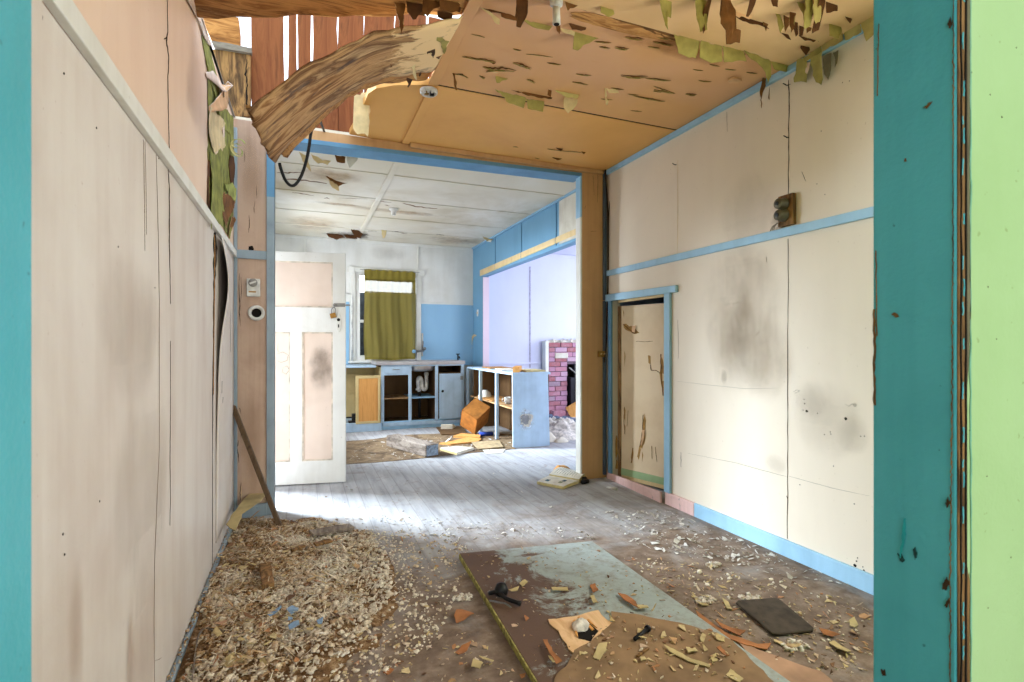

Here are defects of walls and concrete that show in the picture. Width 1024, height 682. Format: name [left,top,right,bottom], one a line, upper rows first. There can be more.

peeling [394,0,461,33]
peeling [427,37,449,59]
peeling [480,0,598,51]
peeling [660,0,874,108]
peeling [492,62,579,113]
peeling [188,0,245,239]
peeling [353,92,370,136]
peeling [648,354,664,396]
peeling [631,415,657,463]